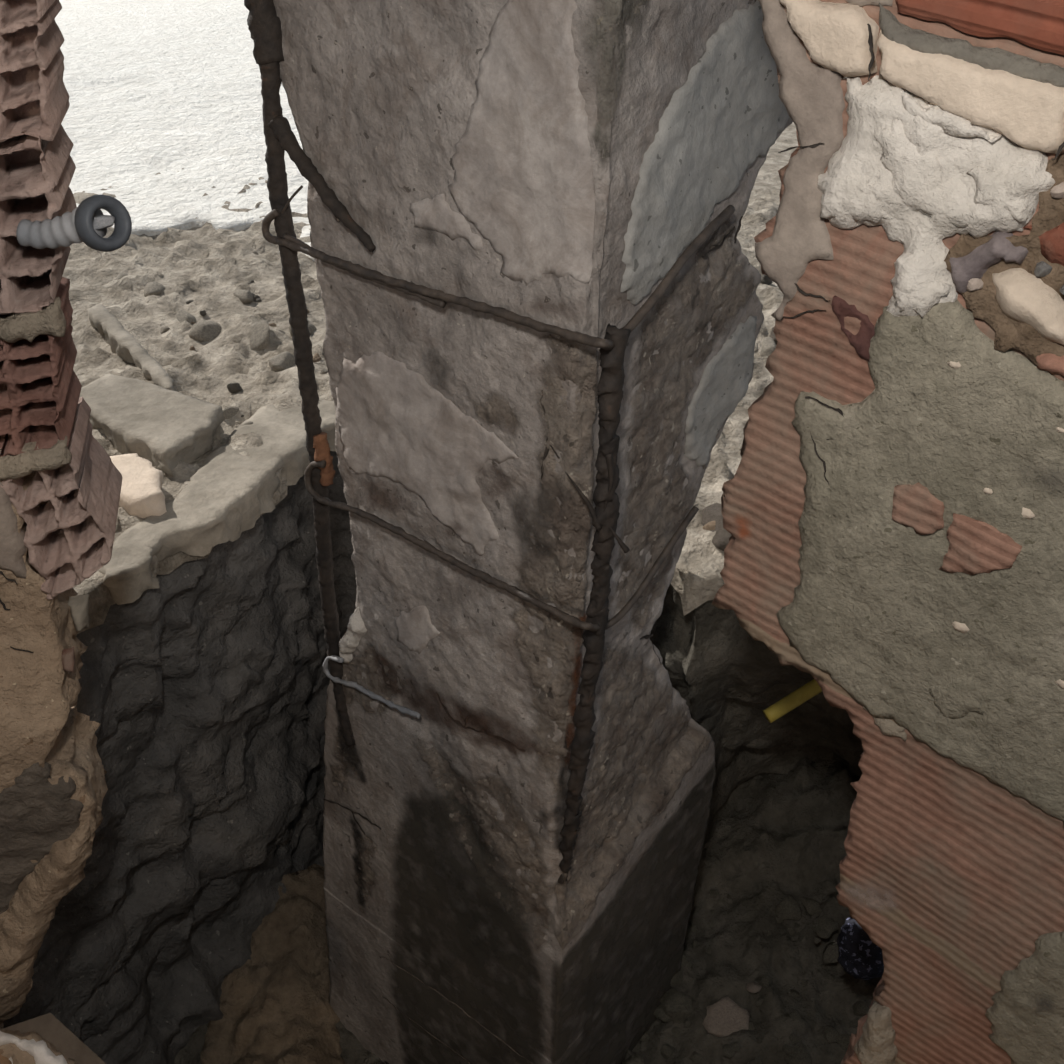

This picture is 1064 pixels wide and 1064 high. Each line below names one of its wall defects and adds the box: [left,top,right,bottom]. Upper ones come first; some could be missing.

peeling [409,0,649,286]
crack [0,571,18,610]
crack [323,799,381,835]
rust [350,819,364,905]
spalling [339,607,405,713]
peeling [336,351,518,556]
leakage [393,765,716,1064]
spalling [513,336,598,792]
rust [542,651,582,851]
spalling [421,651,710,949]
spalling [625,752,882,1064]
peeling [617,0,1064,827]